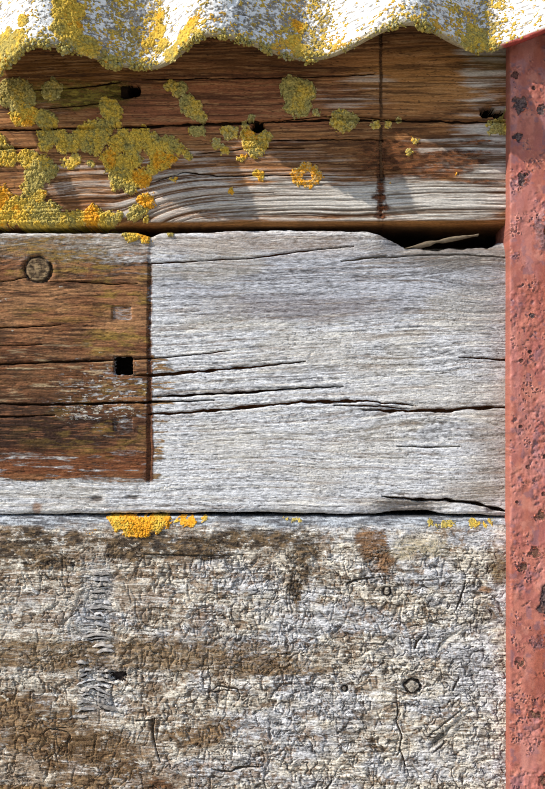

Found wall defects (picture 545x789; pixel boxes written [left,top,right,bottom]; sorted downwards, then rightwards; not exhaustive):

rust [512,96,528,115]
crack [0,325,305,377]
crack [459,355,505,363]
crack [0,386,505,417]
crack [384,496,505,512]
rust [515,547,545,573]
rust [537,585,545,625]